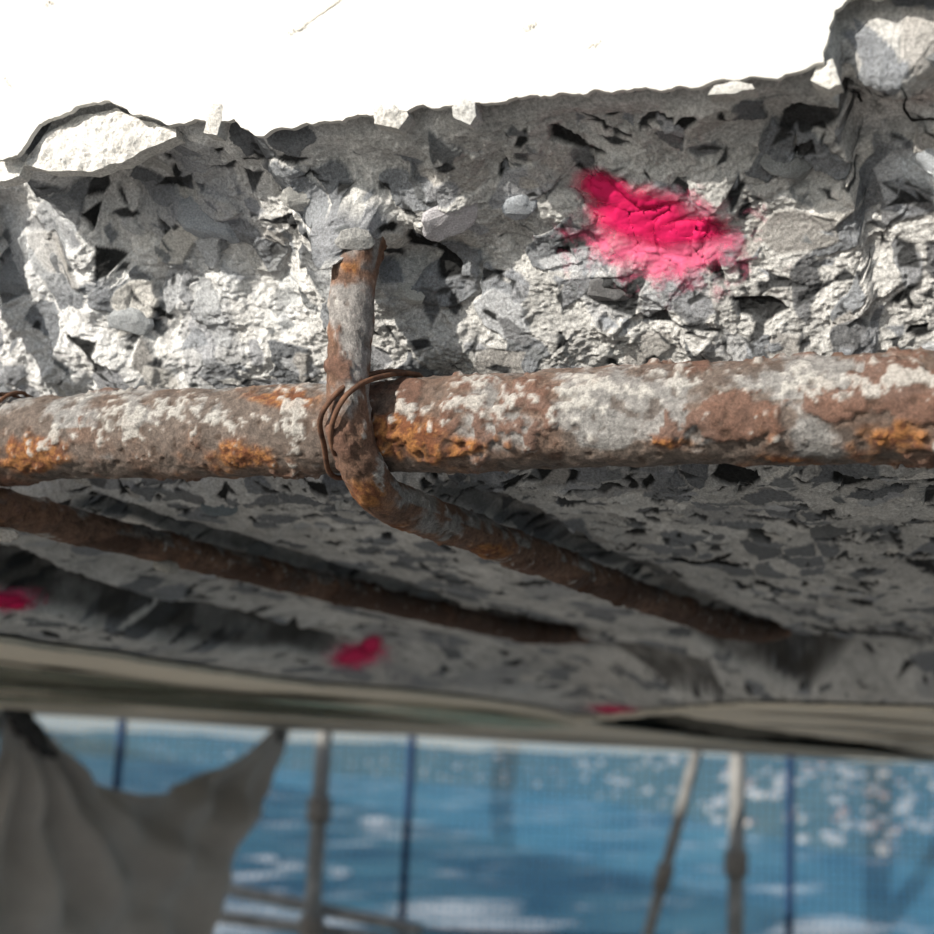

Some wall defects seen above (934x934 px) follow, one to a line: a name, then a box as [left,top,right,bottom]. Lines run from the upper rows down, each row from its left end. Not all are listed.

spalling [0,0,934,399]
spalling [0,463,934,716]